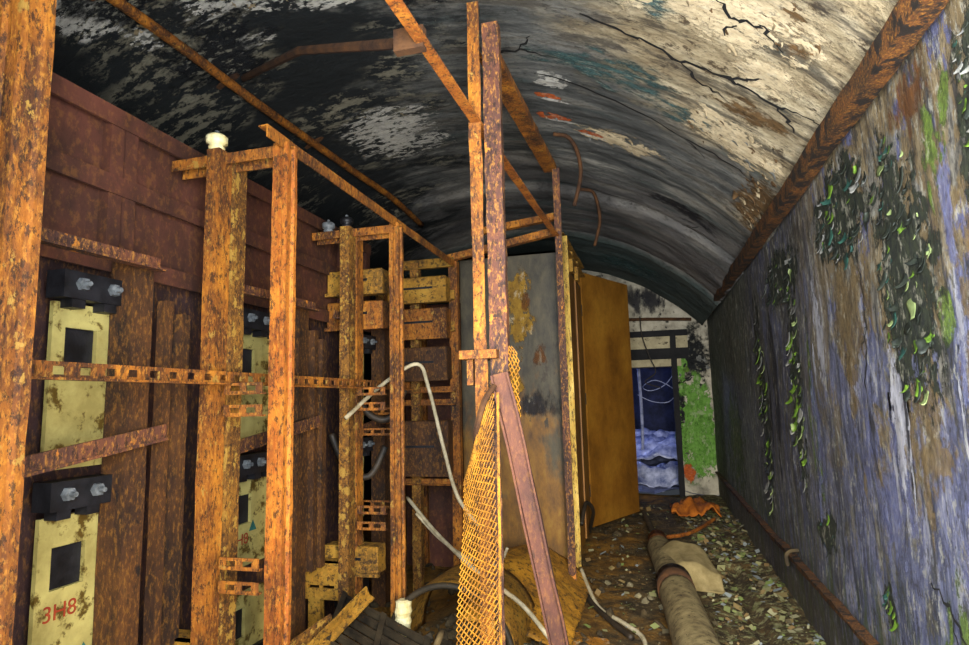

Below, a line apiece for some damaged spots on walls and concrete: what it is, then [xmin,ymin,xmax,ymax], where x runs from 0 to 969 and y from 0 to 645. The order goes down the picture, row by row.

peeling [55,0,162,52]
peeling [236,31,277,50]
peeling [180,0,355,25]
peeling [339,105,455,160]
peeling [533,70,661,160]
crack [501,36,765,195]
crack [579,13,819,133]
peeling [617,0,838,105]
peeling [682,102,785,231]
crack [716,0,783,53]
corrosion [888,45,928,141]
leakage [872,144,969,599]